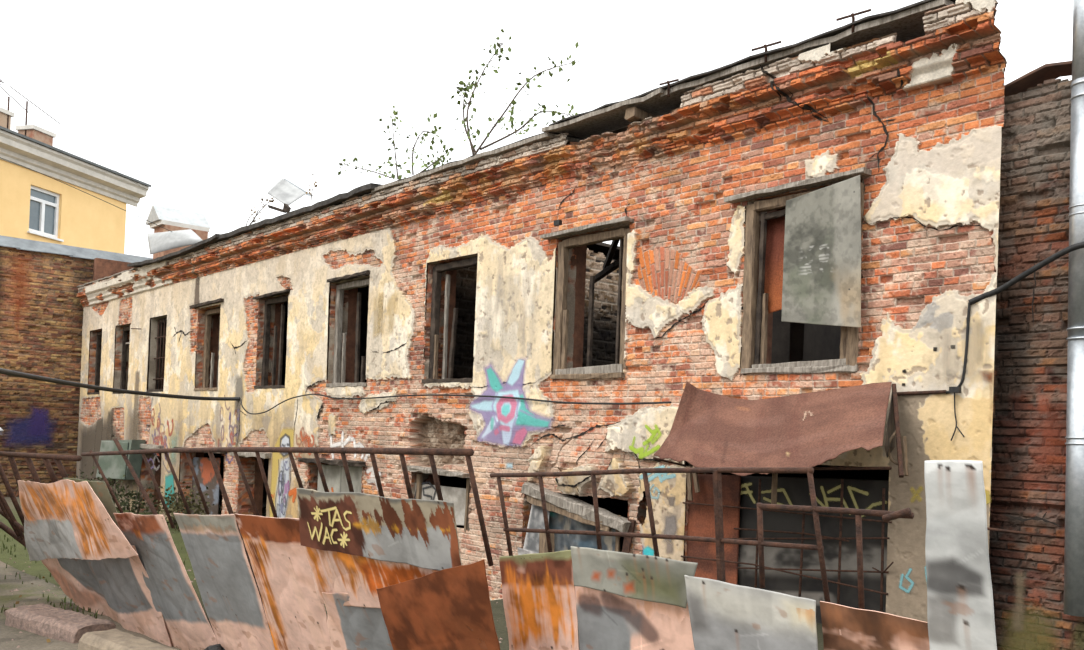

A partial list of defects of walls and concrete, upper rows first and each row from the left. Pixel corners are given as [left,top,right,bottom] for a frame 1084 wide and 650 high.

crack [760,65,831,124]
crack [867,91,895,172]
flaking render [189,304,200,354]
flaking render [243,294,260,392]
flaking render [291,66,1005,622]
corrosion [18,480,166,560]
corrosion [182,494,690,650]